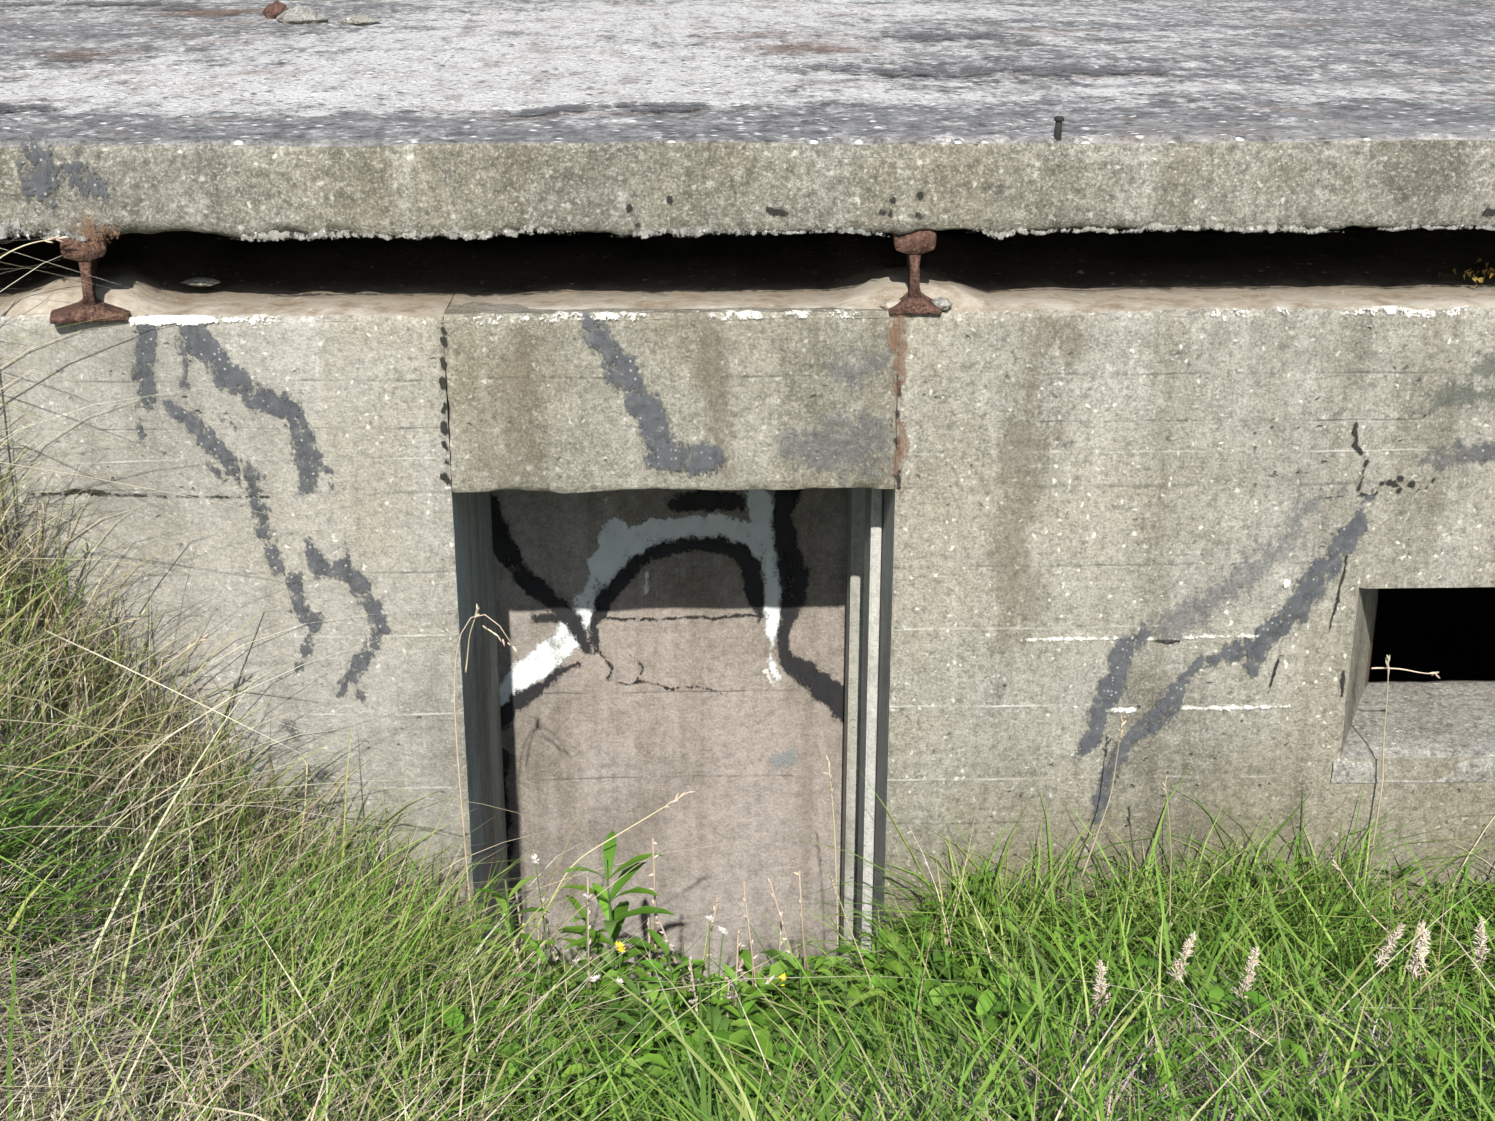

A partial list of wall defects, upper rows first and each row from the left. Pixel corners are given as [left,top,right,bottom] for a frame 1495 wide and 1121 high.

corrosion [888,315,910,397]
corrosion [891,416,910,497]
crack [1326,422,1378,498]
crack [591,613,758,695]